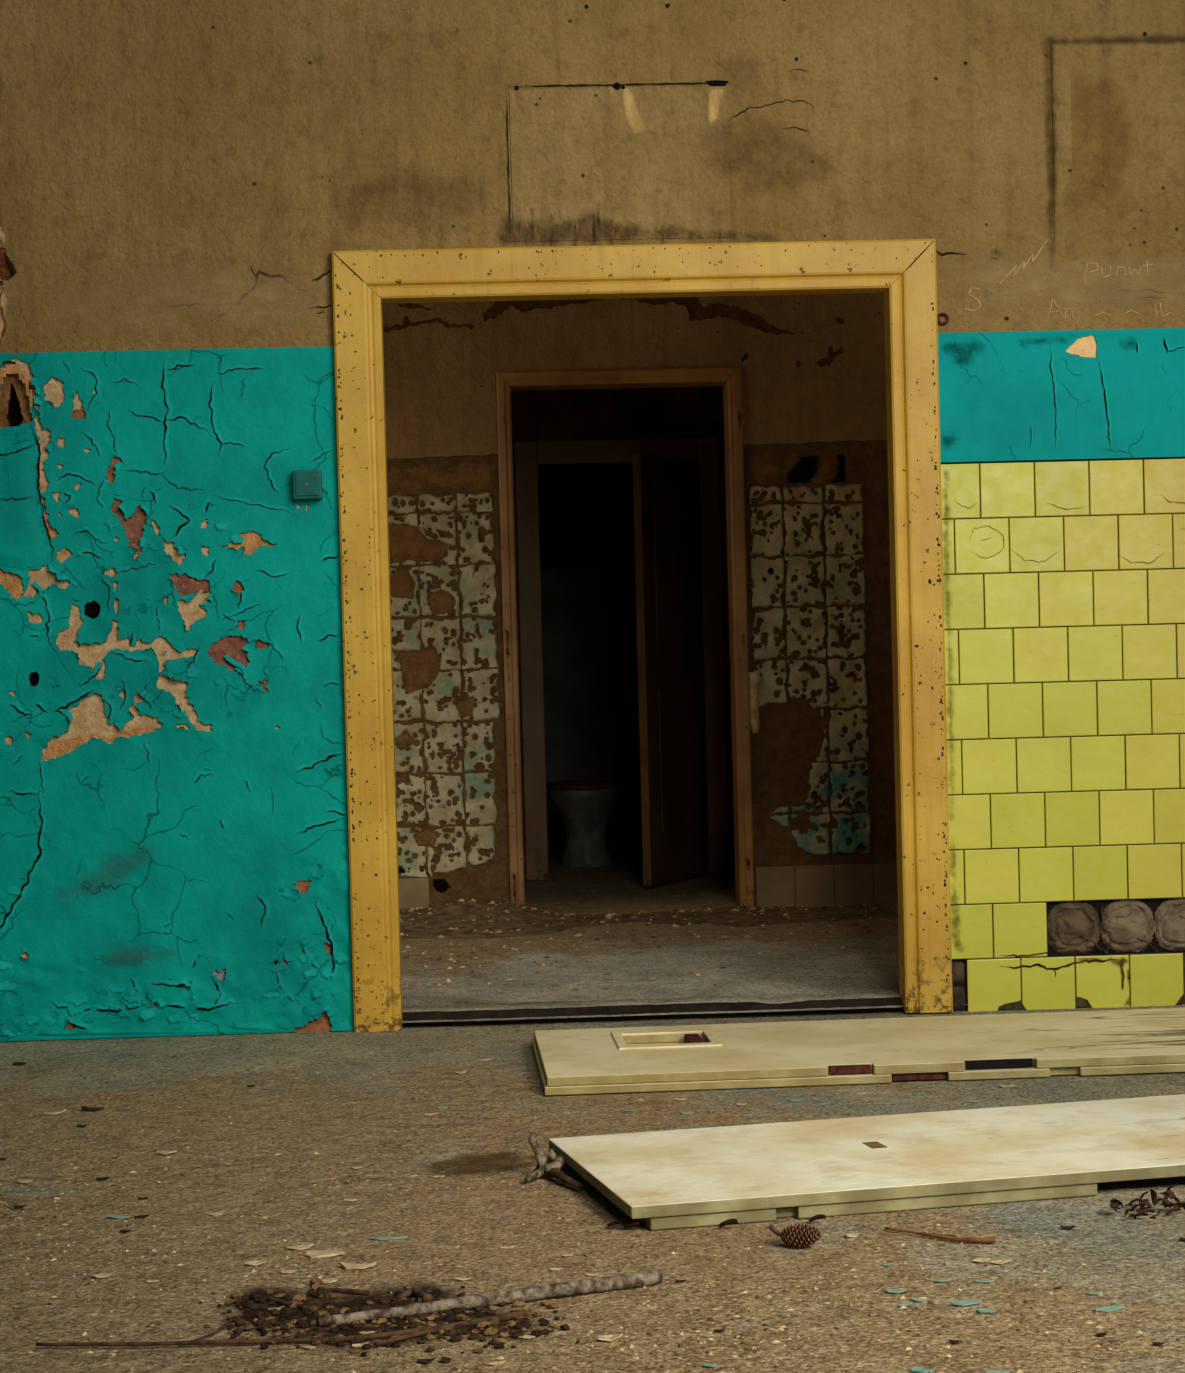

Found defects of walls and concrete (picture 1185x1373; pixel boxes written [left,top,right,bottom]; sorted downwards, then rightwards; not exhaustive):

spalling [0,226,17,285]
peeling [383,297,798,335]
peeling [1066,334,1097,359]
crack [1098,358,1112,452]
peeling [0,358,276,761]
crack [0,359,346,932]
crack [295,680,344,772]
peeling [291,878,312,895]
crack [0,949,239,1030]
crack [227,894,339,1001]
peeling [295,1003,334,1034]
crack [1003,952,1125,990]